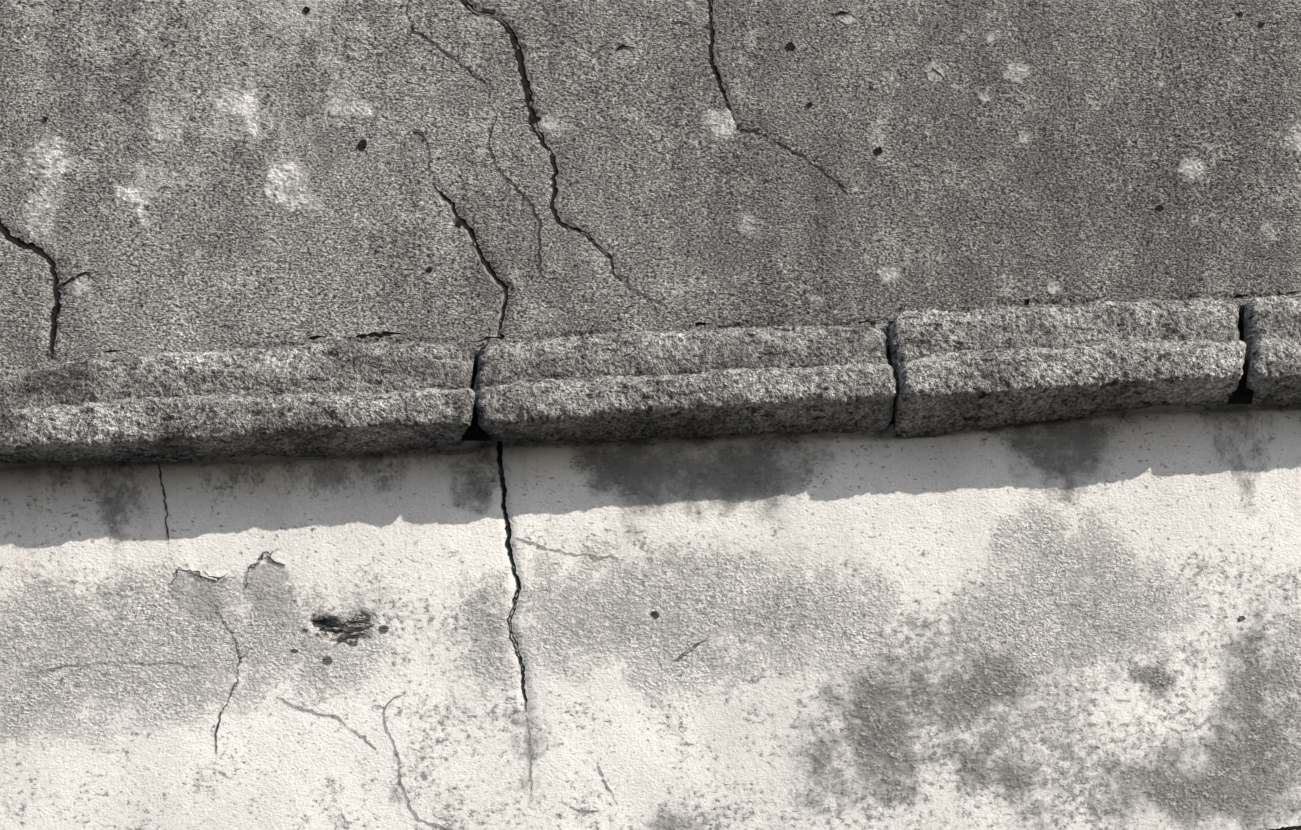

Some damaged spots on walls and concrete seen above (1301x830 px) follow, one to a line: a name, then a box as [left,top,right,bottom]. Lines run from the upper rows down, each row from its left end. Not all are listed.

crack [406,0,678,342]
crack [705,0,851,198]
crack [0,219,92,358]
water stain [575,434,810,506]
water stain [1011,418,1108,498]
flaking render [0,548,393,743]
crack [497,441,622,787]
crack [278,695,448,830]
water stain [802,657,1024,805]
water stain [942,737,1042,814]
water stain [1104,629,1301,829]
crack [1269,822,1301,830]